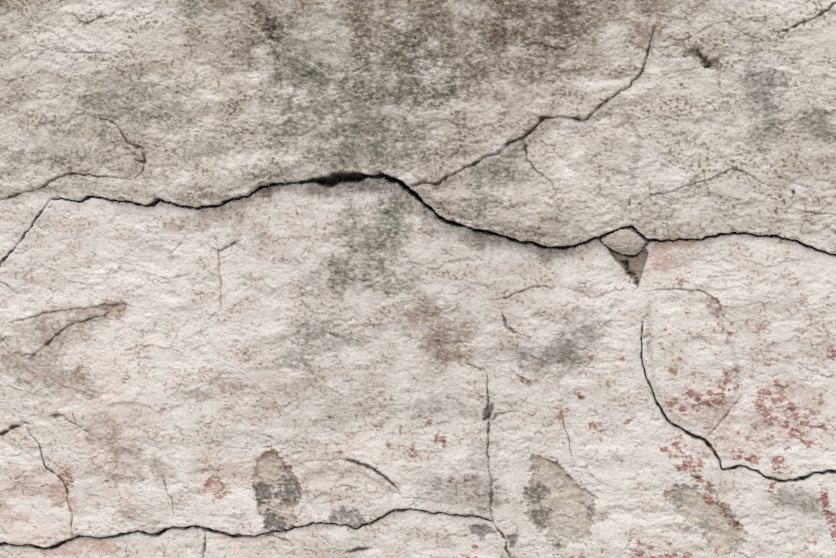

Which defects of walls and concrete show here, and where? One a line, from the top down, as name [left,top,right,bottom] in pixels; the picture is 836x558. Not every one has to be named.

water stain [275,22,436,163]
water stain [764,71,787,131]
crack [105,119,146,163]
crack [507,116,551,169]
crack [44,172,835,257]
flaking render [610,249,648,284]
crack [641,325,836,482]
crack [350,460,395,486]
crack [0,492,510,555]